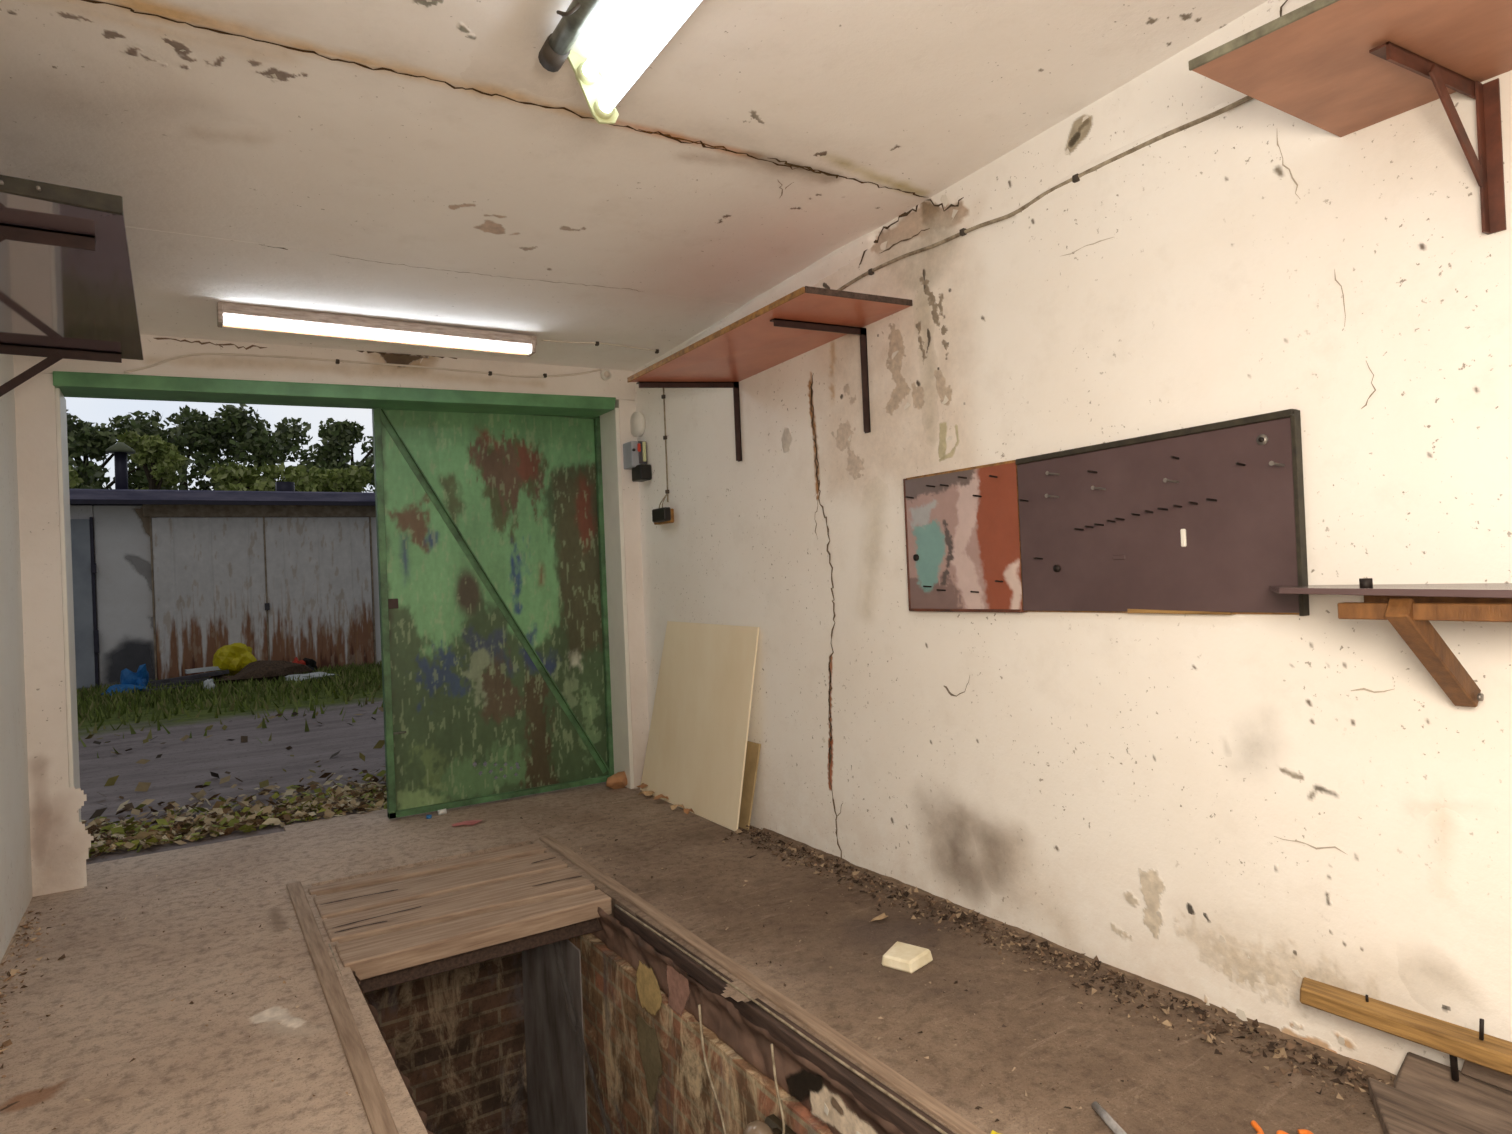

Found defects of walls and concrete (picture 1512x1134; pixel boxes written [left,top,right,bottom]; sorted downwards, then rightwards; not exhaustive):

peeling [49,10,227,71]
peeling [246,59,308,83]
peeling [411,0,444,11]
damp [0,0,912,198]
peeling [455,20,477,41]
crack [81,0,923,197]
spalling [859,194,964,265]
peeling [877,268,966,462]
crack [807,373,843,859]